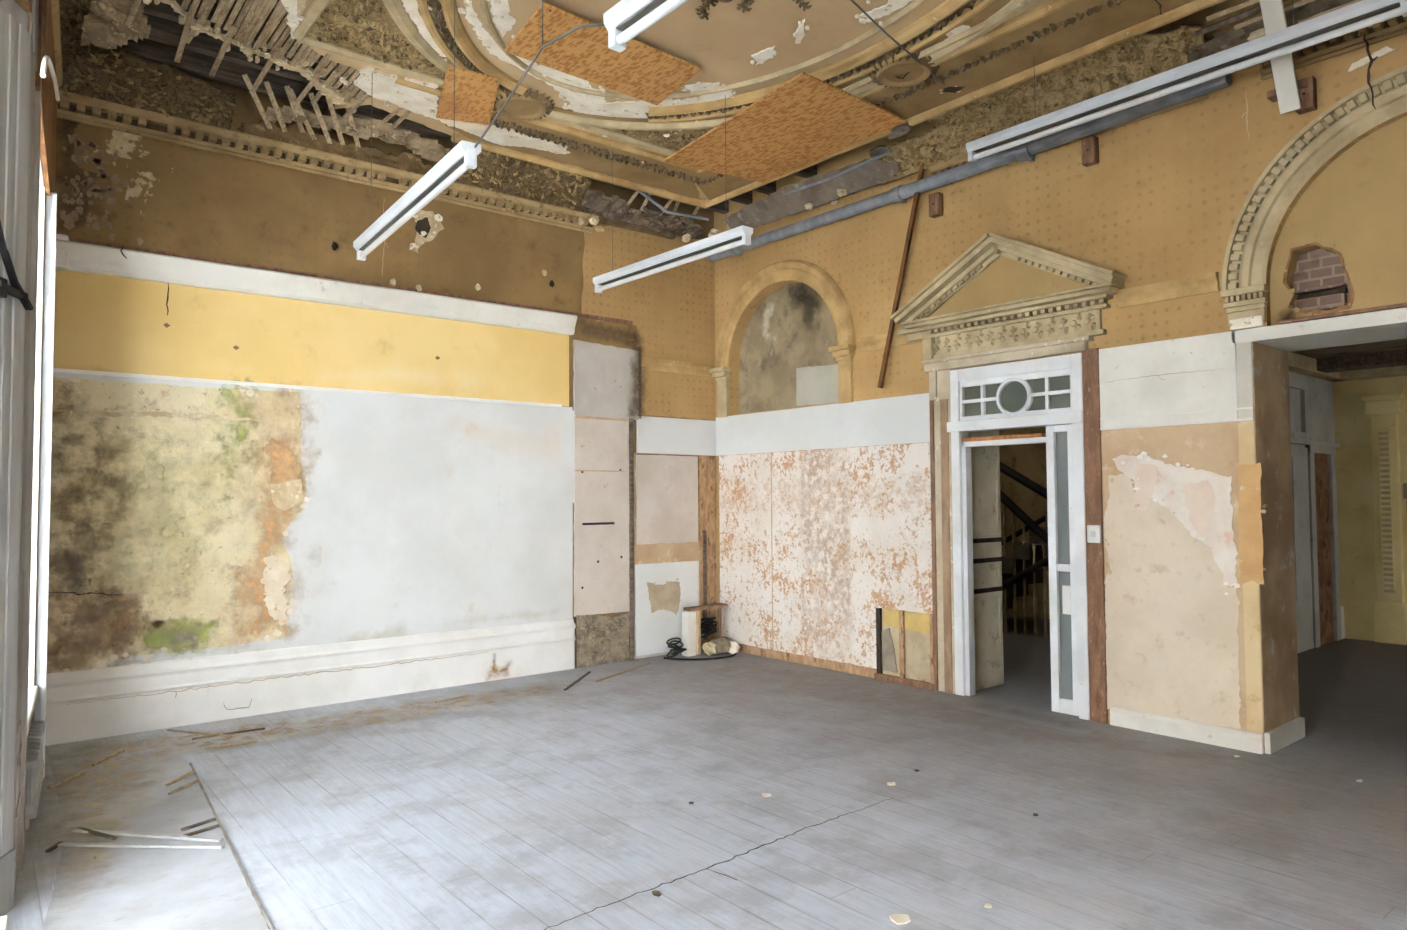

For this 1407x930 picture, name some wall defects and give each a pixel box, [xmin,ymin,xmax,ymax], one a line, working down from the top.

spalling [80,0,570,162]
peeling [855,0,913,26]
crack [1363,34,1378,109]
spalling [410,210,444,253]
water stain [47,349,389,674]
flaking render [1101,422,1247,730]